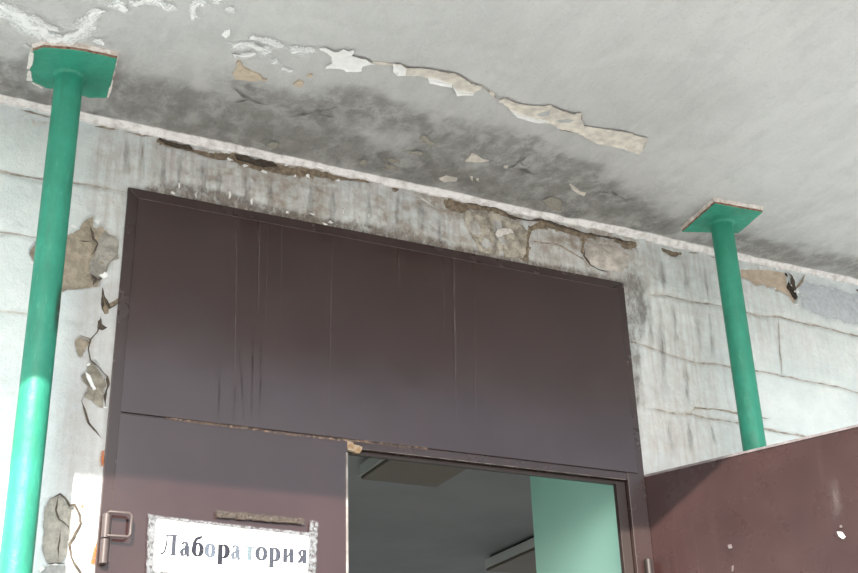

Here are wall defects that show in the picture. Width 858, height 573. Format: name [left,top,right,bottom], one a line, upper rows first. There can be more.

peeling [319,48,647,155]
spalling [156,138,369,183]
spalling [62,217,119,292]
water stain [146,175,652,341]
spalling [444,197,517,221]
crack [400,190,629,274]
crack [652,294,721,306]
spalling [75,314,110,439]
crack [652,407,739,425]
crack [762,417,806,437]
crack [746,312,858,393]
spalling [38,493,82,573]